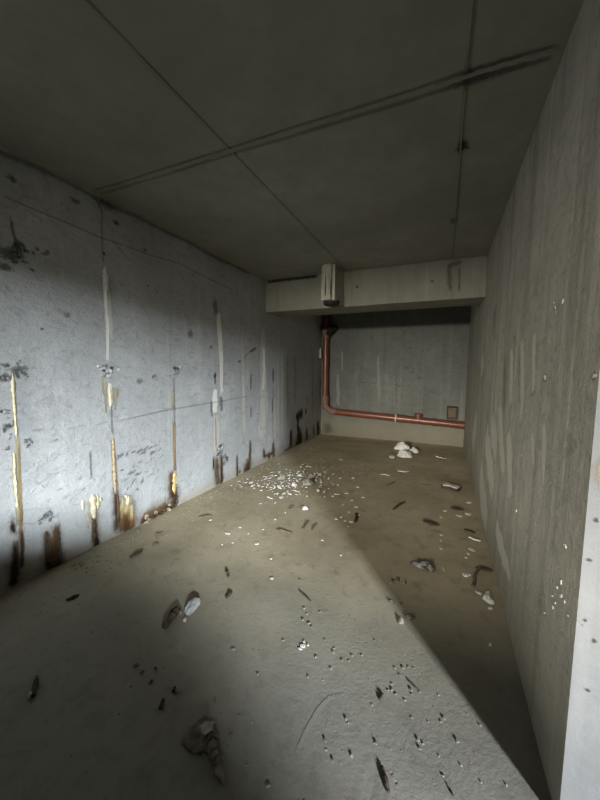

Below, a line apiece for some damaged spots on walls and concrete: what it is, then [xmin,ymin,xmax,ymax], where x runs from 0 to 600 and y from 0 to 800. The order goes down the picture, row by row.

leakage [0,218,50,272]
corrosion [101,377,119,412]
corrosion [212,373,223,483]
corrosion [9,373,24,587]
corrosion [111,437,134,530]
corrosion [81,494,103,546]
corrosion [44,526,61,569]